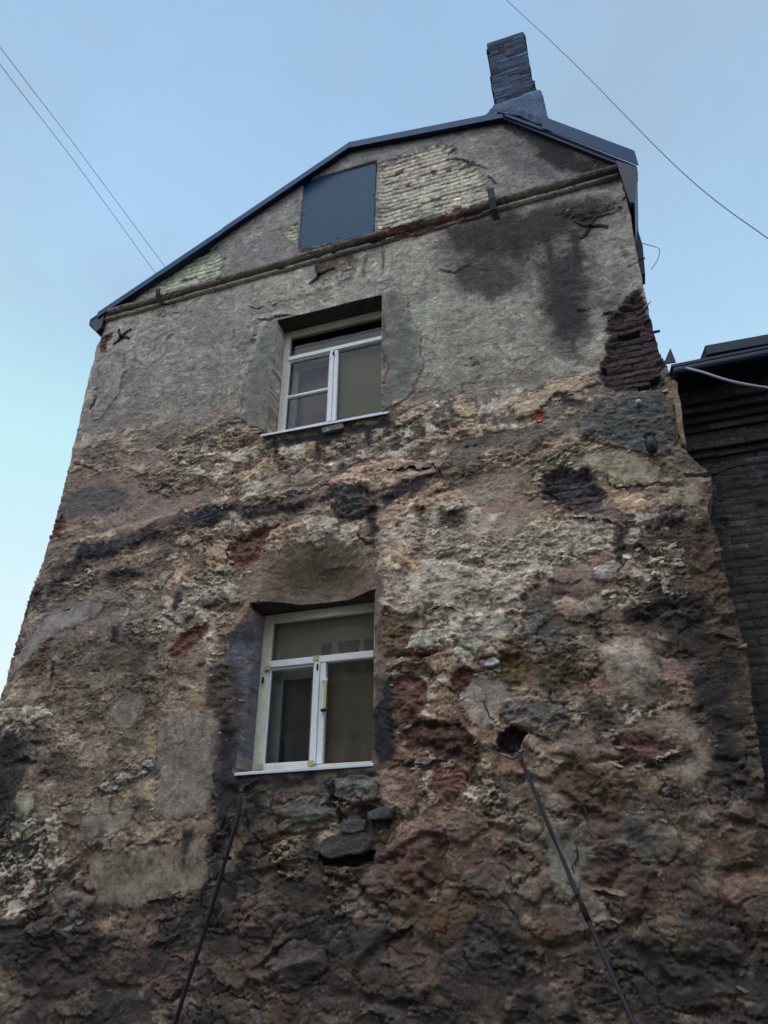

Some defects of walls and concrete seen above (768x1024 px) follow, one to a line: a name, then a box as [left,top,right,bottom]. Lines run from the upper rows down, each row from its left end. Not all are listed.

flaking render [375,143,496,231]
flaking render [132,245,226,317]
water stain [447,196,609,301]
flaking render [511,290,668,422]
flaking render [49,518,65,540]
flaking render [145,416,663,515]
flaking render [677,472,712,507]
flaking render [8,524,278,681]
flaking render [379,502,747,816]
flaking render [0,602,245,990]
flaking render [541,698,718,918]
flaking render [268,829,447,920]